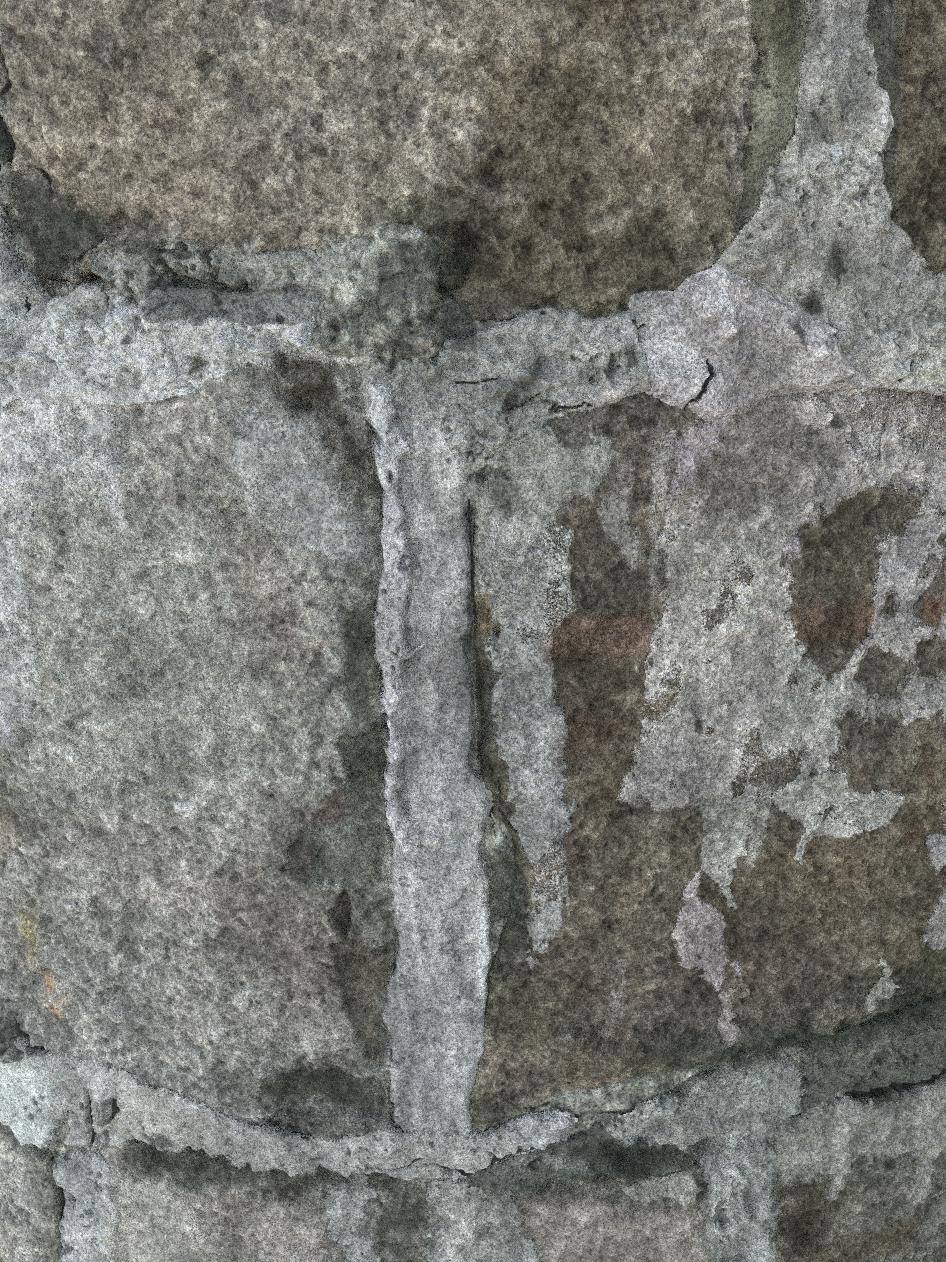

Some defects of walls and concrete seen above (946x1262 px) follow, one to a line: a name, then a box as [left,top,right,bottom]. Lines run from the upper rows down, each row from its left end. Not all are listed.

crack [0,55,52,195]
crack [455,377,498,385]
crack [508,394,590,411]
crack [684,360,714,409]